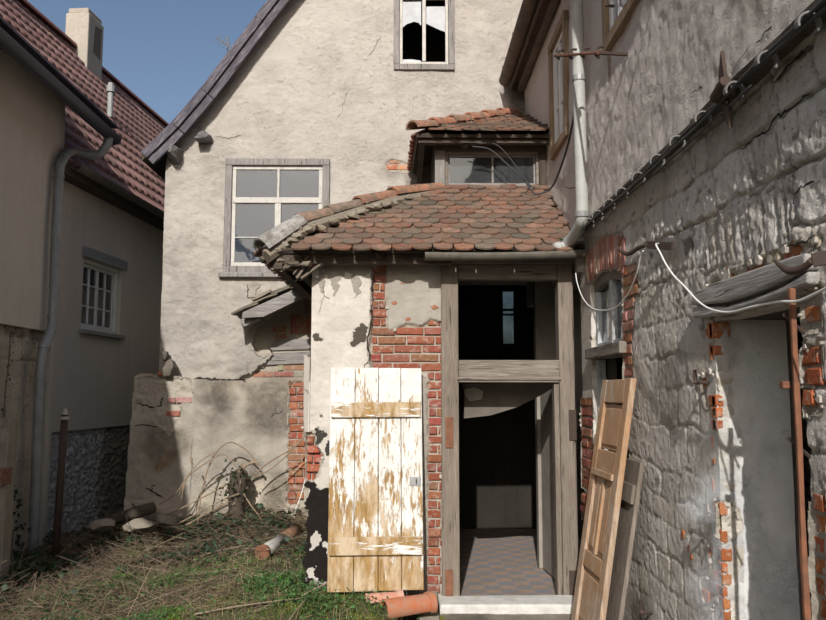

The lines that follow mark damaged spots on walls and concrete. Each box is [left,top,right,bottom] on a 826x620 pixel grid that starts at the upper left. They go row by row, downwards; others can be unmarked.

flaking render [383,159,418,173]
crack [737,91,812,154]
flaking render [133,375,195,434]
crack [196,346,274,381]
flaking render [242,298,324,517]
flaking render [316,265,442,596]
flaking render [697,317,730,465]
flaking render [797,281,826,419]
peeling [309,531,328,557]
flaking render [700,478,743,620]
flaking render [807,491,826,620]